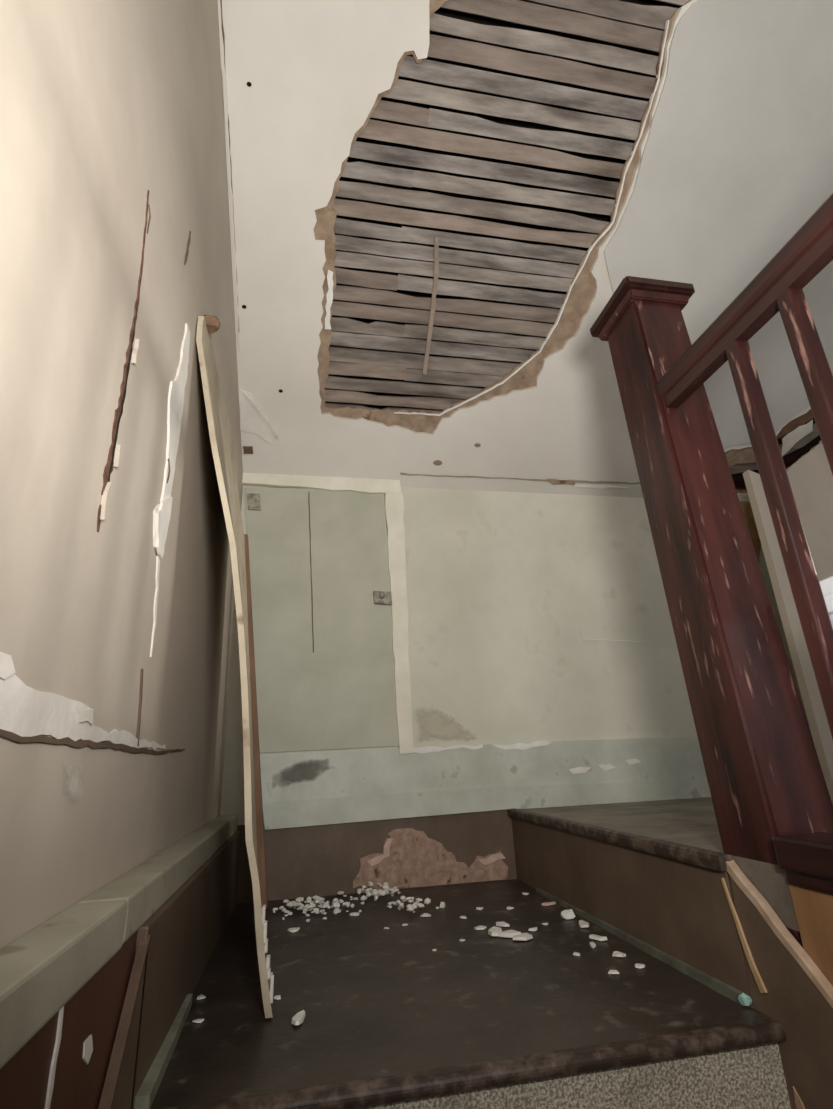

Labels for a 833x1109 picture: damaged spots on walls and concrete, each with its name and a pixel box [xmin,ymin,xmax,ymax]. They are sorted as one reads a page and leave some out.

flaking render [314,0,691,434]
crack [97,190,151,532]
peeling [150,323,190,658]
flaking render [725,447,761,563]
flaking render [776,409,821,469]
peeling [0,652,166,751]
water stain [281,762,326,782]
peeling [353,828,508,890]